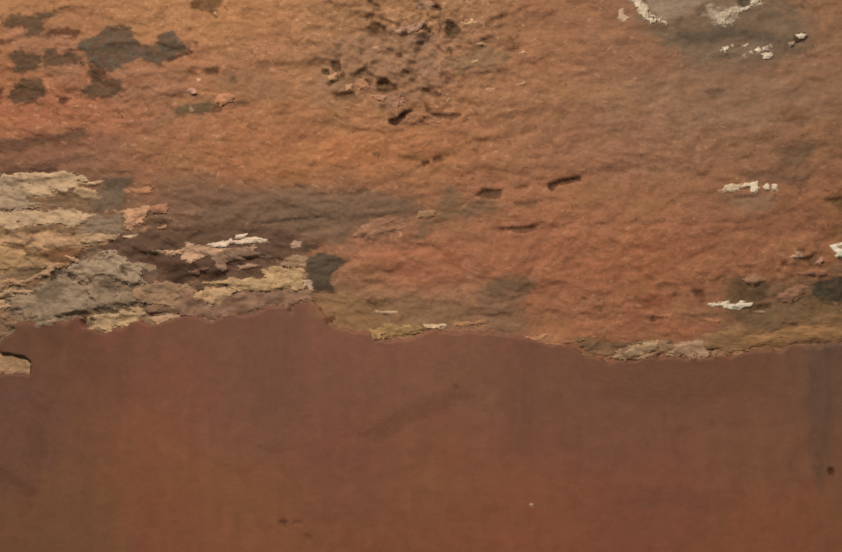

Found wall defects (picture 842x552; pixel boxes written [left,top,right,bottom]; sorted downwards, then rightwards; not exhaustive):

mould [0,6,187,103]
damp [618,0,808,65]
flaking render [0,0,842,374]
damp [808,268,842,303]